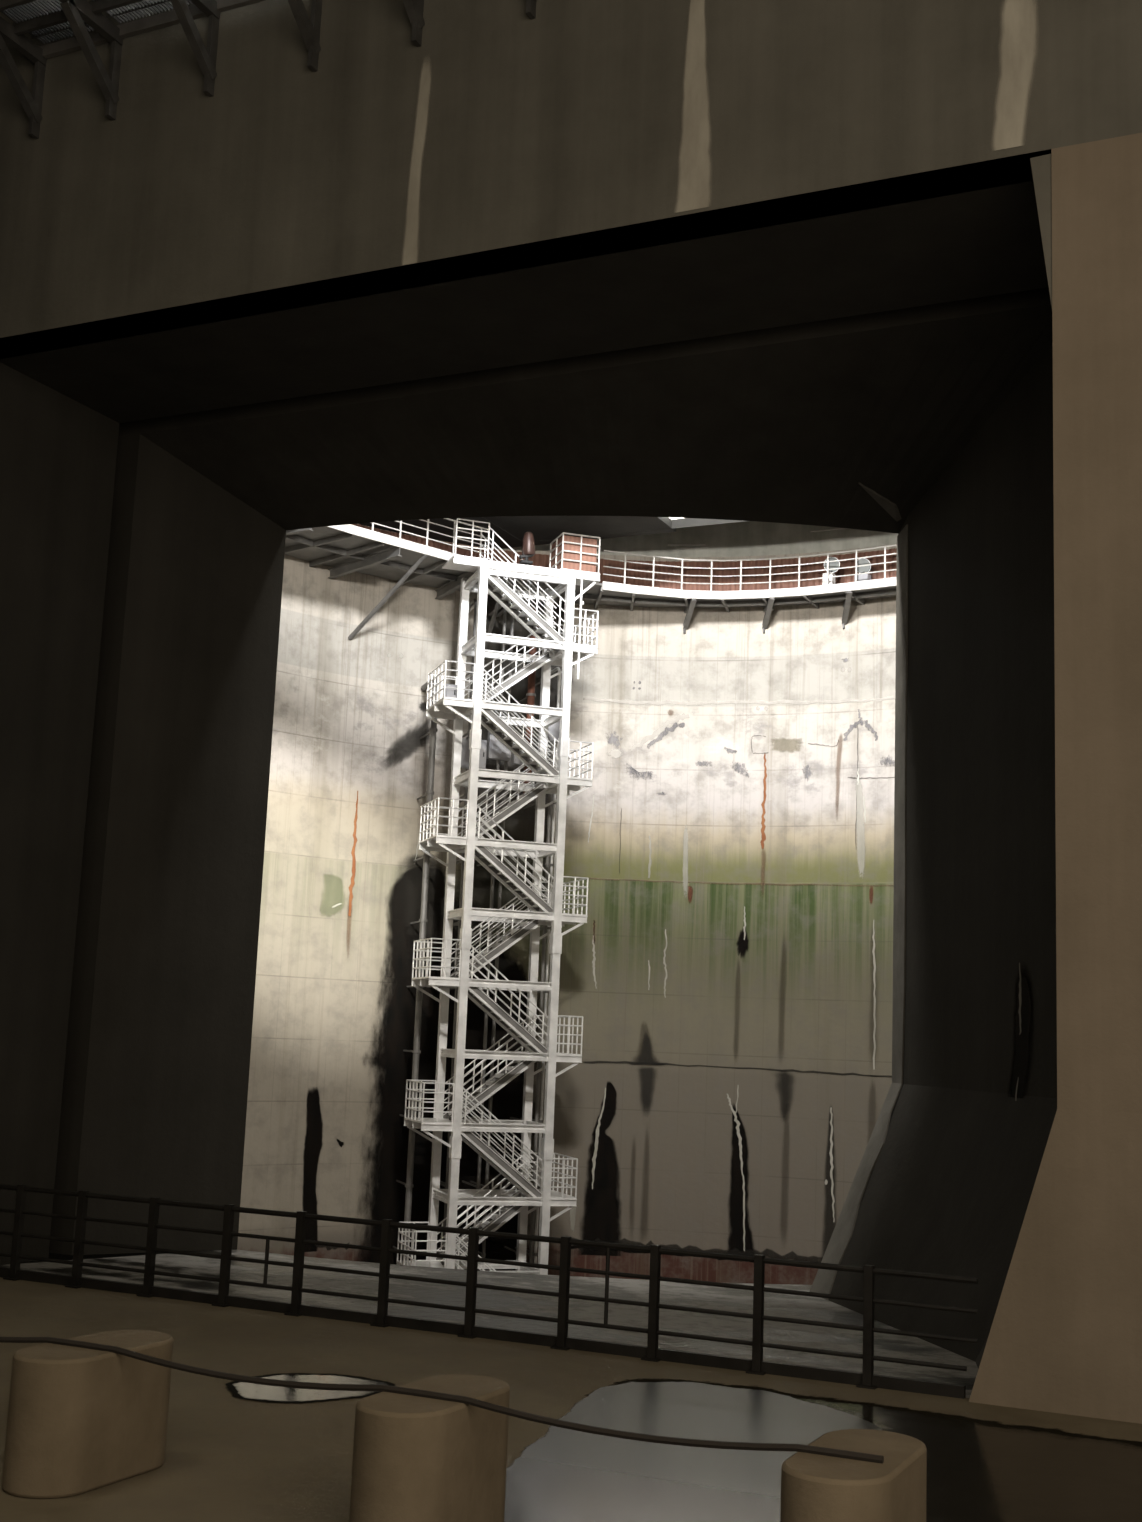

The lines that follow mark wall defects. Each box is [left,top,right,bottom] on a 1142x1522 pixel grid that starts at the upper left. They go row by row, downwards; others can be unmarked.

corrosion [348,791,358,916]
leakage [303,595,565,1270]
leakage [648,929,668,998]
leakage [737,906,748,956]
leakage [638,1034,659,1110]
crack [584,921,892,1256]
leakage [571,1082,823,1263]